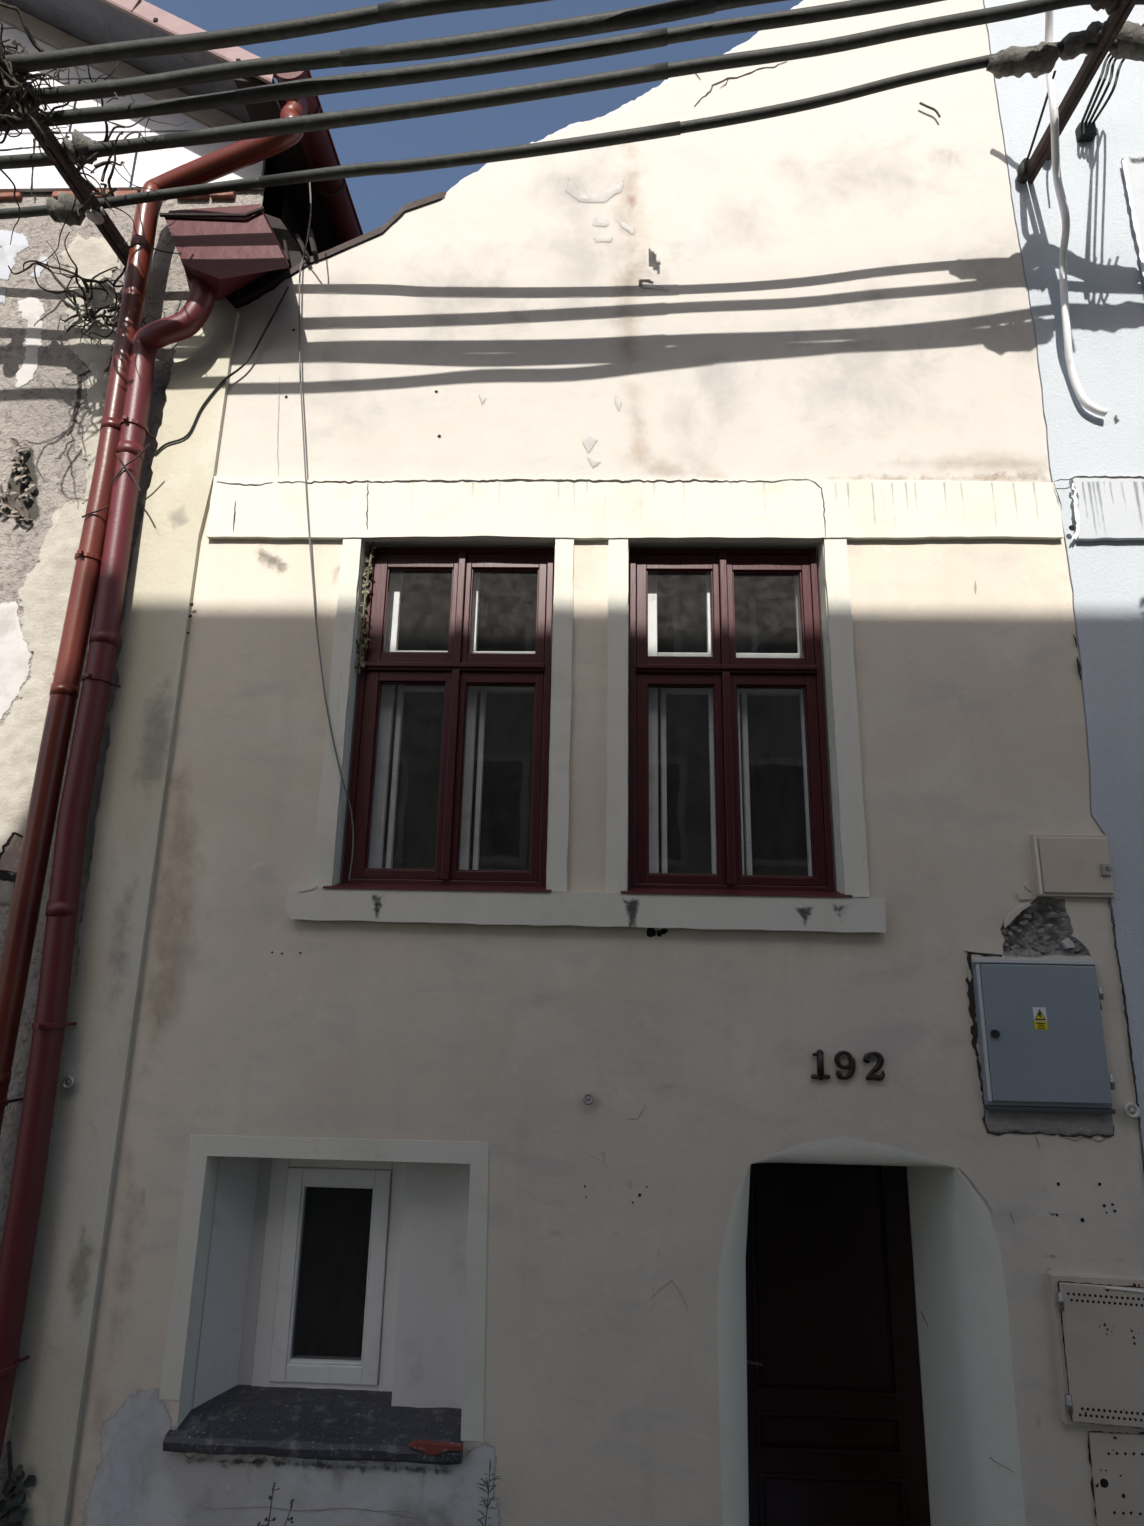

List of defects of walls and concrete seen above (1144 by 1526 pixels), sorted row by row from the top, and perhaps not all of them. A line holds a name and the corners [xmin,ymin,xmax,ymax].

crack [694,61,787,107]
crack [66,370,91,436]
peeling [0,229,121,904]
spalling [963,882,1095,1104]
peeling [81,1389,500,1526]